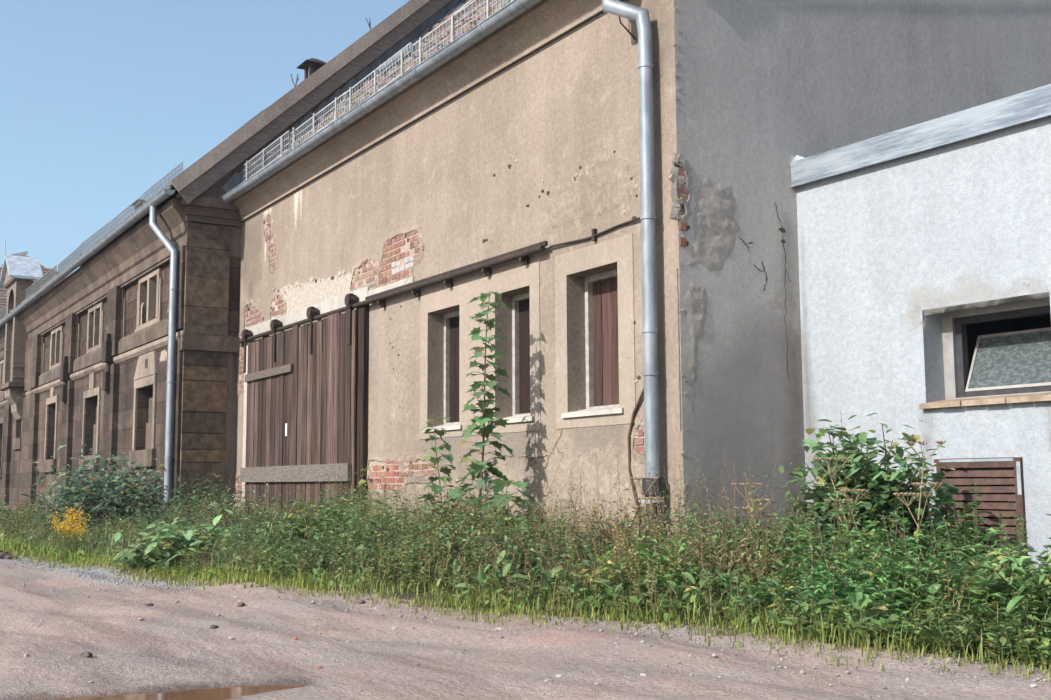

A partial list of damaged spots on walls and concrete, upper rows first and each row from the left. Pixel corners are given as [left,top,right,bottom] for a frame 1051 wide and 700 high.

flaking render [262,212,279,273]
flaking render [669,153,693,246]
flaking render [237,224,424,397]
flaking render [367,452,439,500]